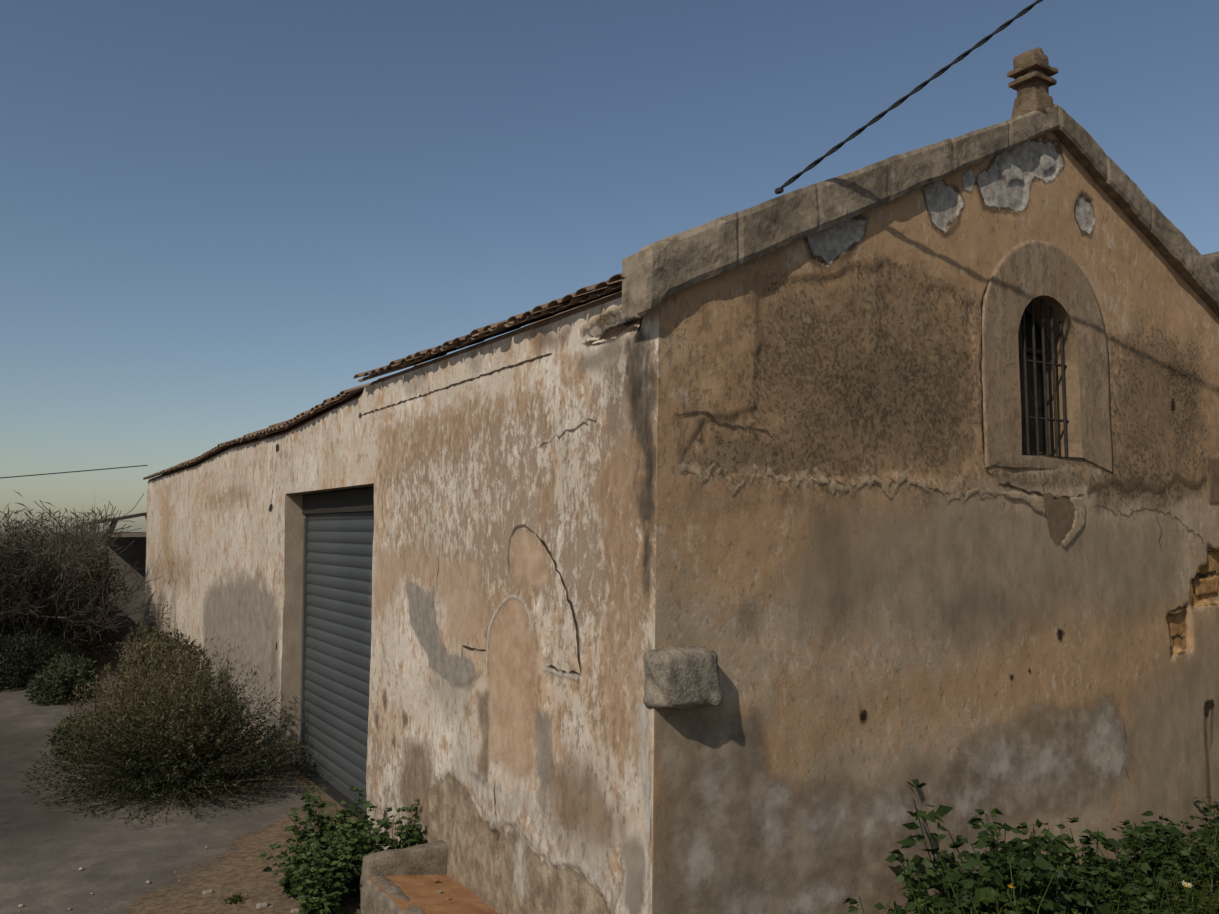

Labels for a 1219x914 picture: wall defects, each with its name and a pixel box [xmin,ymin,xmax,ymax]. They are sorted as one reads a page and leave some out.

flaking render [922,137,1065,236]
flaking render [1075,191,1096,238]
flaking render [675,215,1211,548]
water stain [625,330,655,588]
crack [1091,504,1204,550]
spalling [1166,547,1219,656]
water stain [637,698,1129,914]